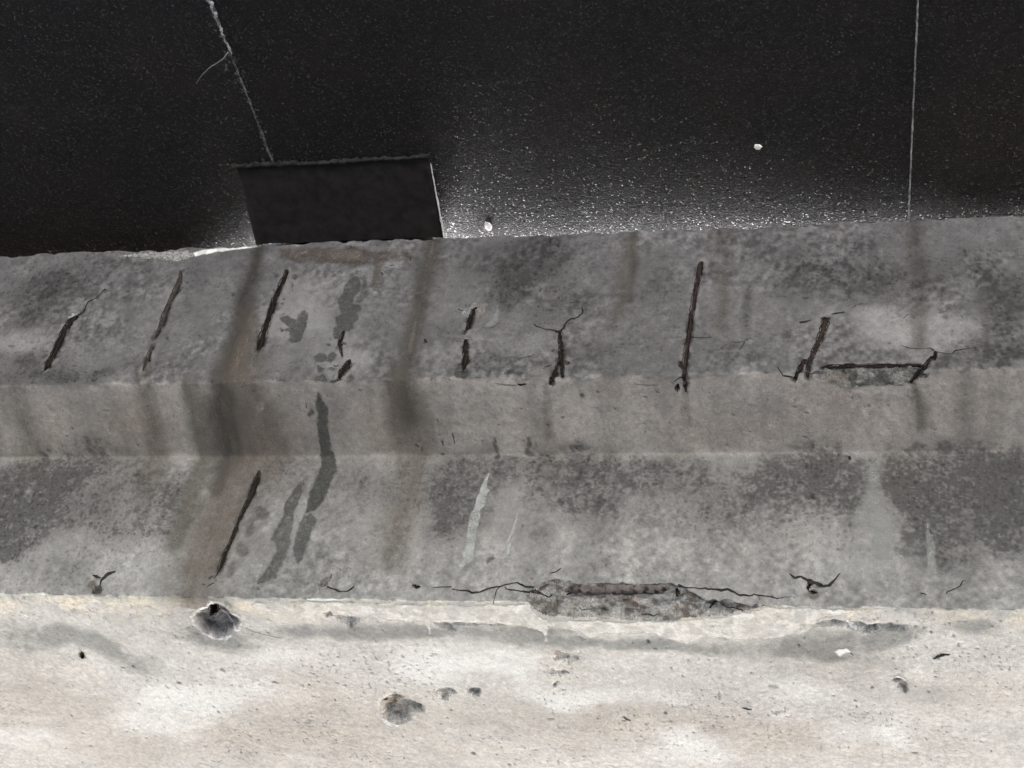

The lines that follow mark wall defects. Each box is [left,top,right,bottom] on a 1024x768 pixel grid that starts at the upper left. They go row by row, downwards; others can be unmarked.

spalling [777,311,970,388]
damp [258,390,337,583]
crack [433,568,561,604]
crack [677,573,840,599]
spalling [110,601,242,640]
peeling [252,578,912,688]
spalling [375,694,427,727]